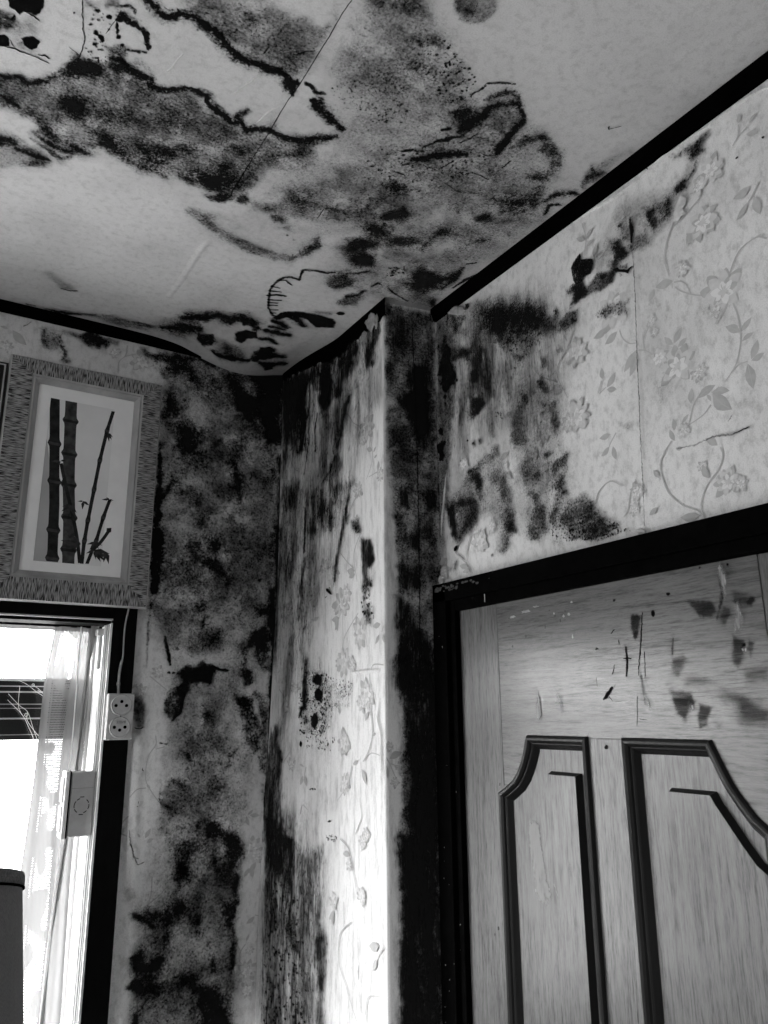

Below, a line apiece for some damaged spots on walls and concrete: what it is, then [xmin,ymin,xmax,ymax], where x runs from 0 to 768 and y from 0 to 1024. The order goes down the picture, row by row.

leakage [0,0,578,1024]
leakage [385,297,630,1024]
leakage [582,167,606,188]
leakage [610,130,709,276]